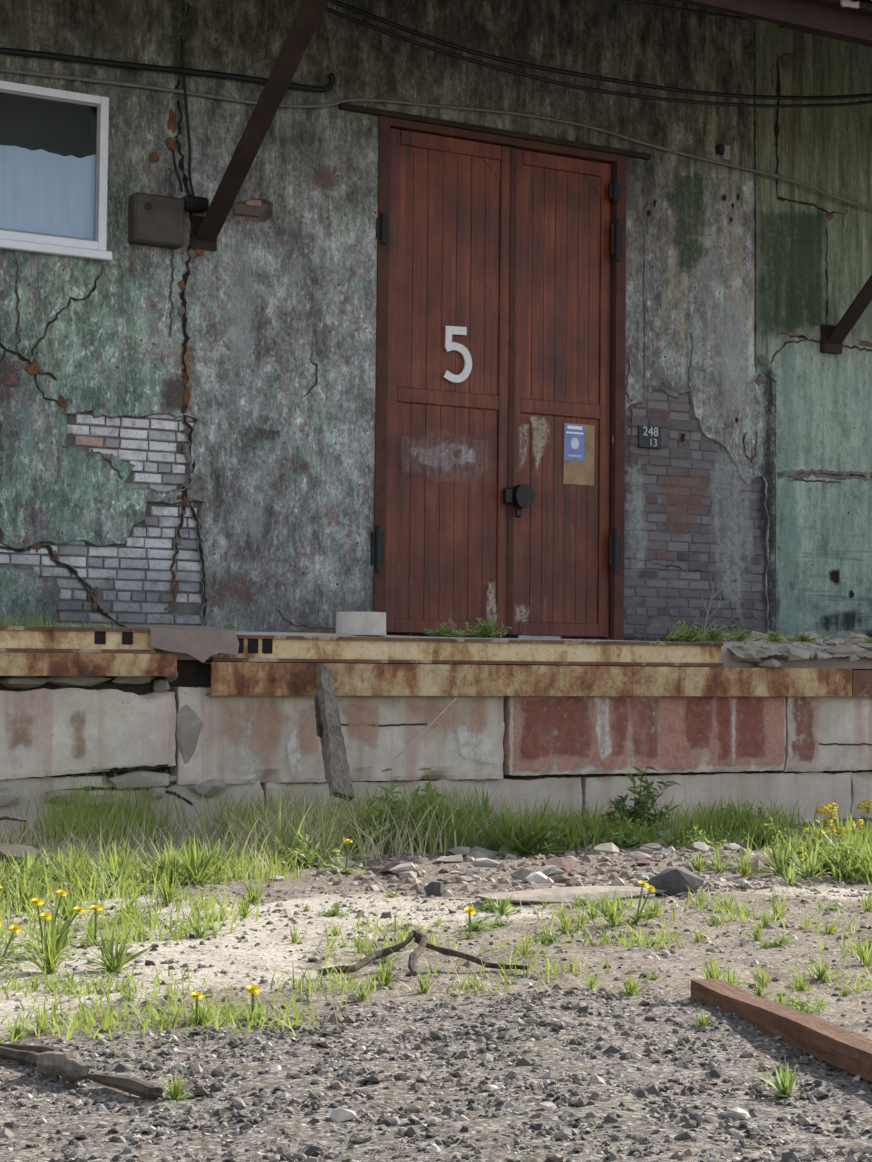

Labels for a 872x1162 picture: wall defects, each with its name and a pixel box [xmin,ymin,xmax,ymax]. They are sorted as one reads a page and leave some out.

crack [0,260,104,411]
crack [149,0,208,626]
leakage [761,213,823,335]
crack [0,539,129,628]
crack [90,448,123,480]
flaking render [0,378,254,628]
flaking render [612,387,872,661]
leakage [712,354,798,635]
crack [788,477,841,485]
leakage [822,611,872,638]
rust [503,696,817,772]